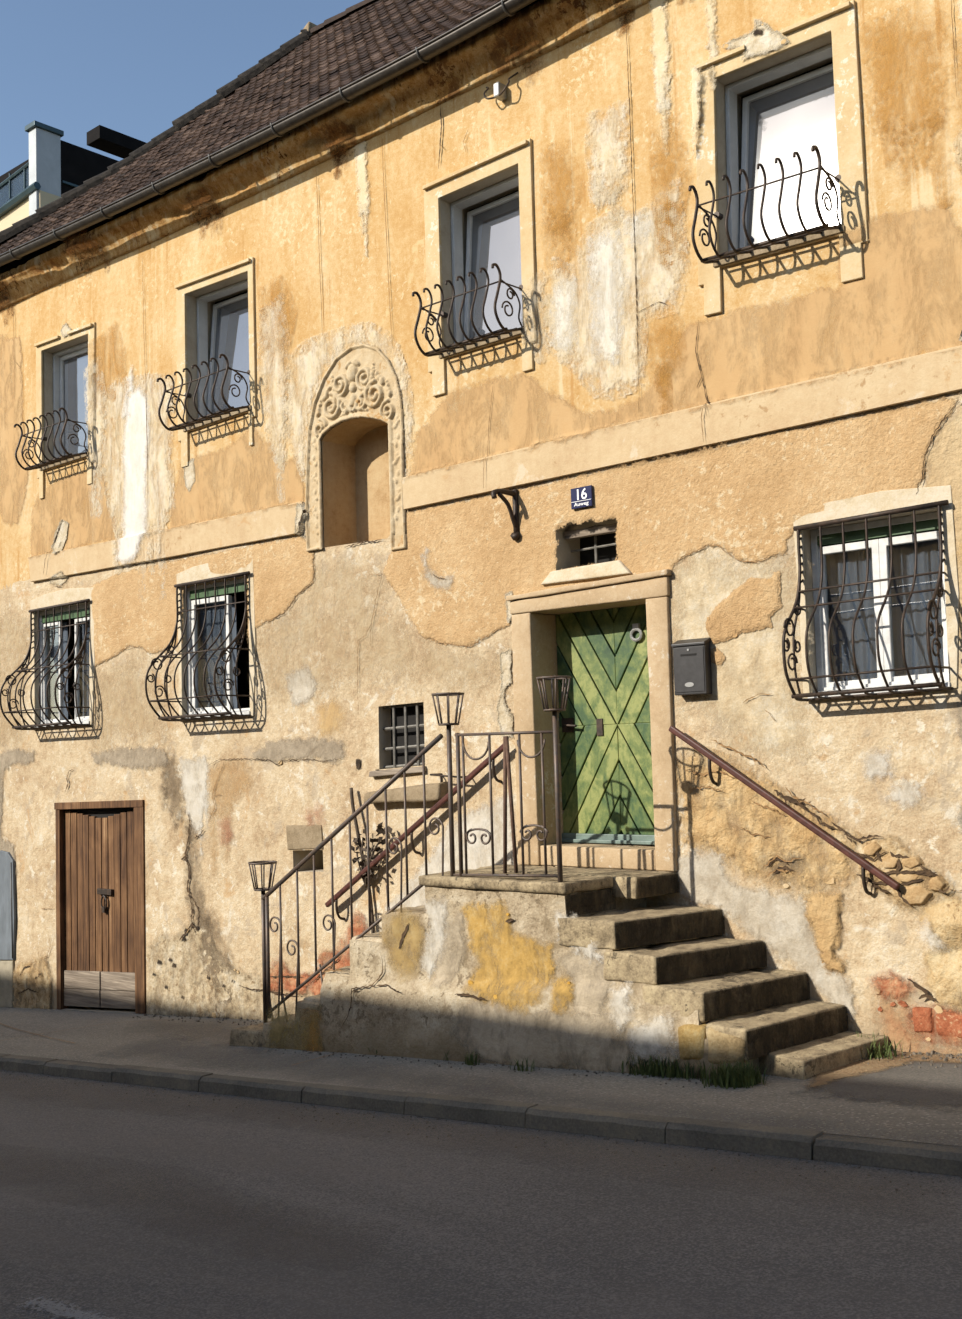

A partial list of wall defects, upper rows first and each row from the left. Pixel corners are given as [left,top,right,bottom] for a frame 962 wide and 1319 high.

spalling [722,19,789,61]
damp [184,187,224,232]
damp [319,116,370,256]
damp [90,332,167,595]
crack [917,405,962,489]
peeling [925,406,962,638]
peeling [0,614,26,743]
peeling [669,551,860,974]
crack [181,758,338,936]
spalling [147,911,367,1020]
peeling [462,902,575,1012]
spalling [872,972,962,1054]